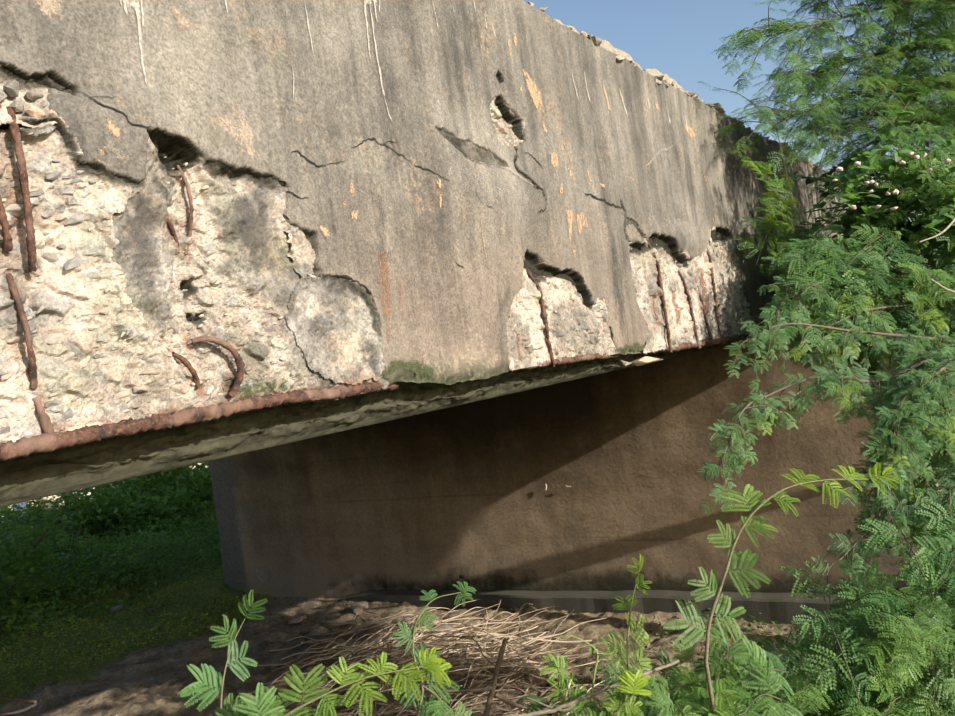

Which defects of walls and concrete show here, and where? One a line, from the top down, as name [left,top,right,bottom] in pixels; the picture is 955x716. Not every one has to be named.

rust [6,106,37,272]
crack [79,91,153,128]
spalling [0,65,389,444]
rust [0,273,399,461]
crack [290,137,449,181]
leakage [364,0,392,120]
spalling [489,94,528,147]
rust [509,268,621,372]
crack [585,193,648,250]
spalling [493,225,759,372]
rust [639,239,769,355]
leakage [329,567,857,595]